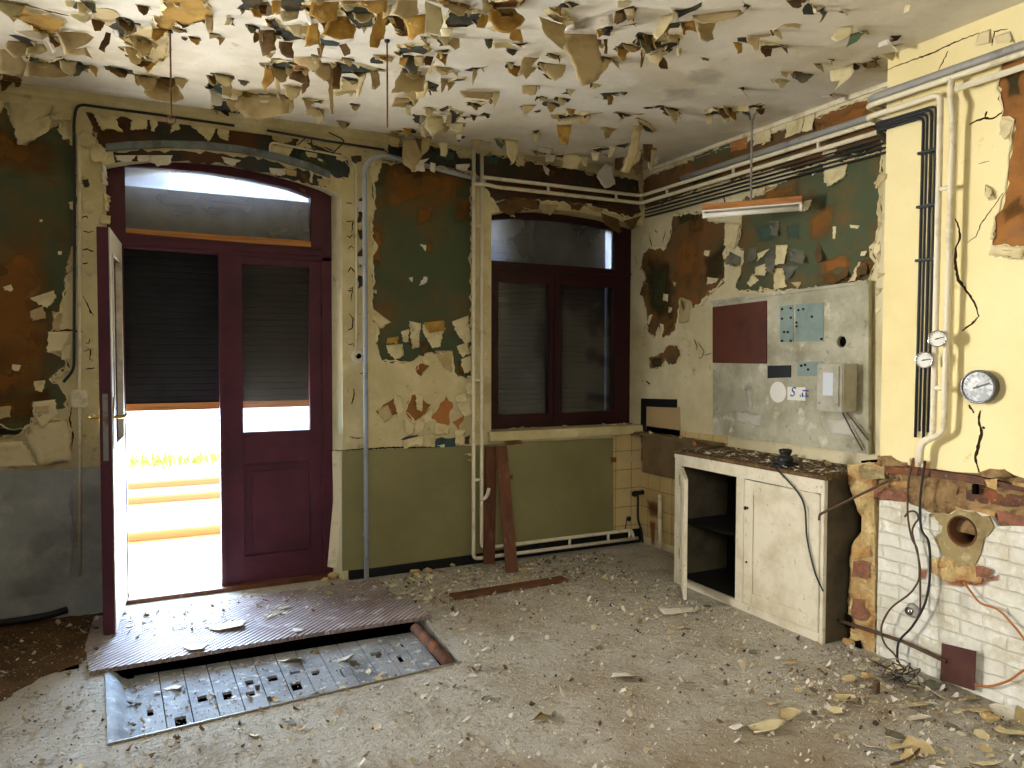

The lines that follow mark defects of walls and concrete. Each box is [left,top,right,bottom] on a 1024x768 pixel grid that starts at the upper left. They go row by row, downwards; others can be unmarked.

crack [888,29,1007,70]
peeling [0,0,902,468]
crack [954,193,1003,331]
peeling [984,59,1024,260]
crack [968,404,985,472]
flaking render [818,455,1024,768]